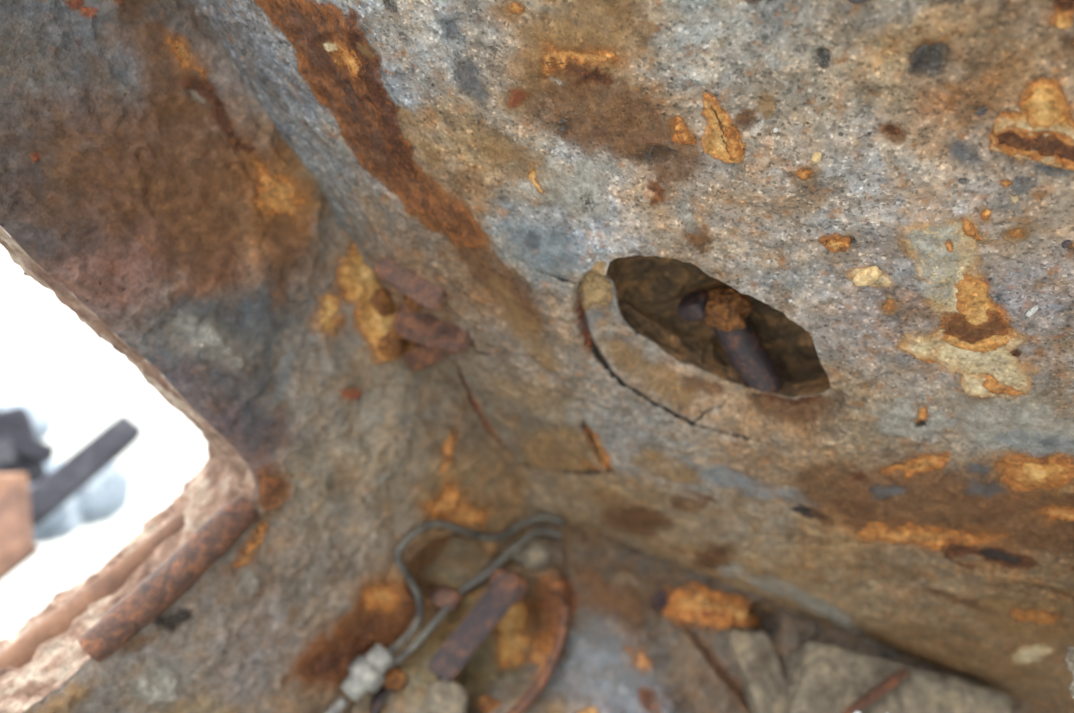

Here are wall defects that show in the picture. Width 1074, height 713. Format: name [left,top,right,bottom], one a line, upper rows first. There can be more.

rust [505,0,700,205]
rust [736,109,756,126]
rust [251,0,552,370]
crack [540,271,759,441]
spalling [577,255,750,387]
spalling [746,295,831,397]
rust [795,452,1074,551]
spalling [140,670,178,701]
rust [286,582,426,687]
rust [651,581,760,632]
rust [694,546,730,570]